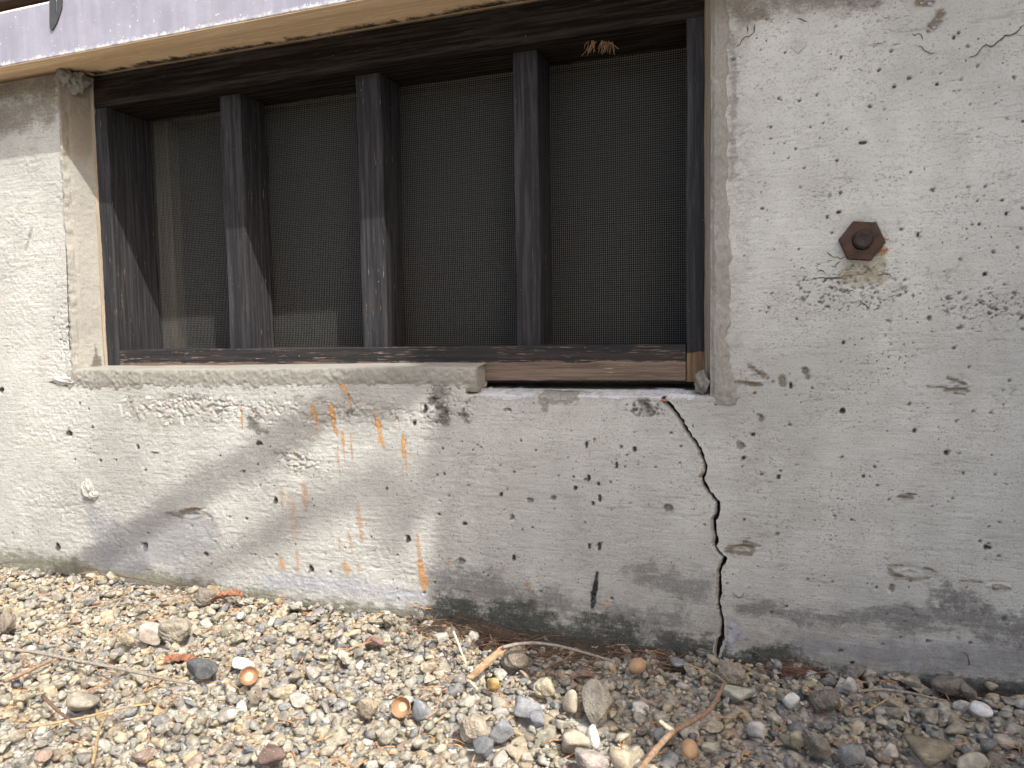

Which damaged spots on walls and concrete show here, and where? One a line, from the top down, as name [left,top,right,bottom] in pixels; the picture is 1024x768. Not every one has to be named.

rust [311,404,352,458]
rust [374,414,385,448]
crack [659,397,744,658]
damp [591,572,599,608]
damp [737,564,1024,650]